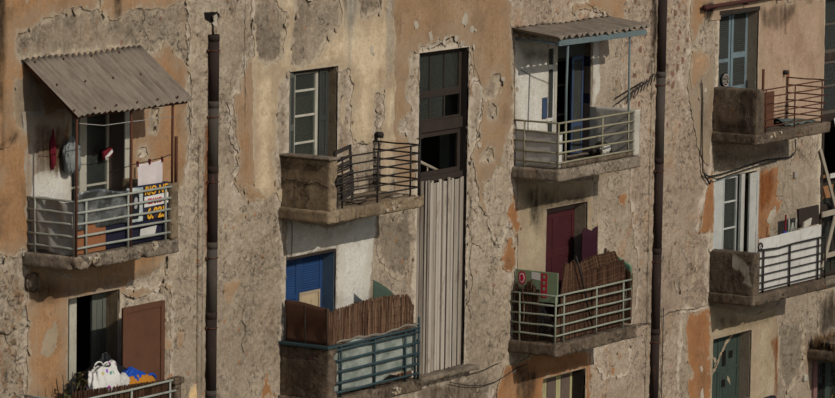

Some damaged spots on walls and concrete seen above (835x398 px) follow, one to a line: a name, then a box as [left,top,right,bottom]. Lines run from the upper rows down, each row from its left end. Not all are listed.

flaking render [398,11,477,181]
flaking render [510,0,608,37]
flaking render [14,0,342,398]
flaking render [413,74,522,398]
flaking render [583,0,715,398]
peeling [732,254,752,287]
peeling [758,166,782,242]